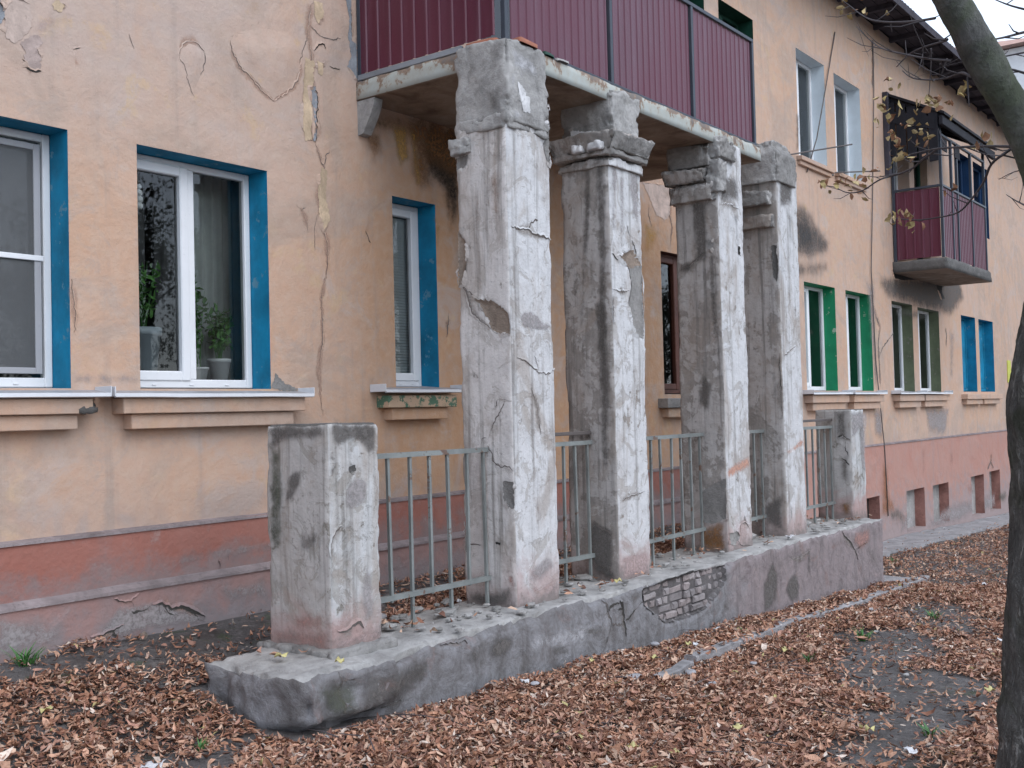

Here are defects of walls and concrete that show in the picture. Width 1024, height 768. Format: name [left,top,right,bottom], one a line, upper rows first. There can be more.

spalling [0,0,44,70]
spalling [518,82,531,113]
crack [230,0,341,410]
water stain [377,121,457,213]
crack [512,219,551,240]
water stain [780,183,827,254]
spalling [456,231,510,338]
spalling [616,250,644,339]
crack [447,287,555,472]
water stain [271,423,374,544]
crack [601,600,643,641]
flaking render [642,565,726,623]